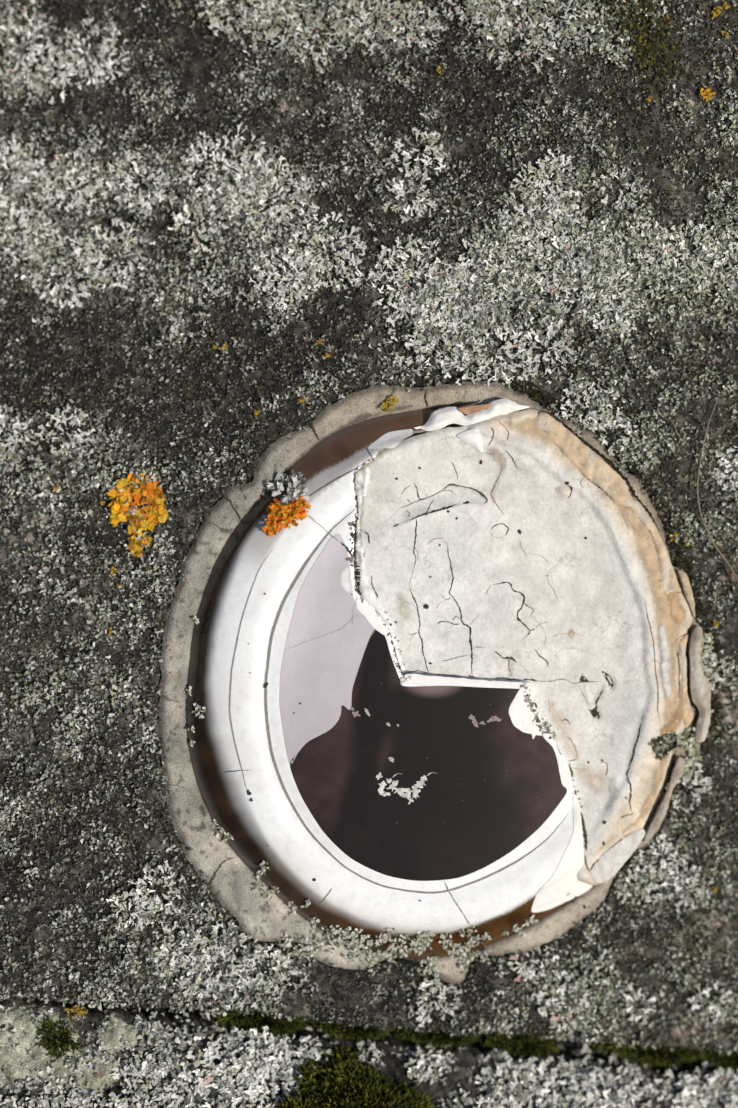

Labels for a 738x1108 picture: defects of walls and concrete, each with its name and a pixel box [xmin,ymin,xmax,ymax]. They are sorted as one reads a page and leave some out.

peeling [368,429,413,449]
spalling [382,478,488,527]
peeling [535,412,695,617]
peeling [340,567,397,636]
crack [288,423,683,885]
spalling [580,671,613,719]
water stain [659,626,671,697]
peeling [678,634,694,728]
peeling [376,757,434,804]
peeling [468,685,645,913]